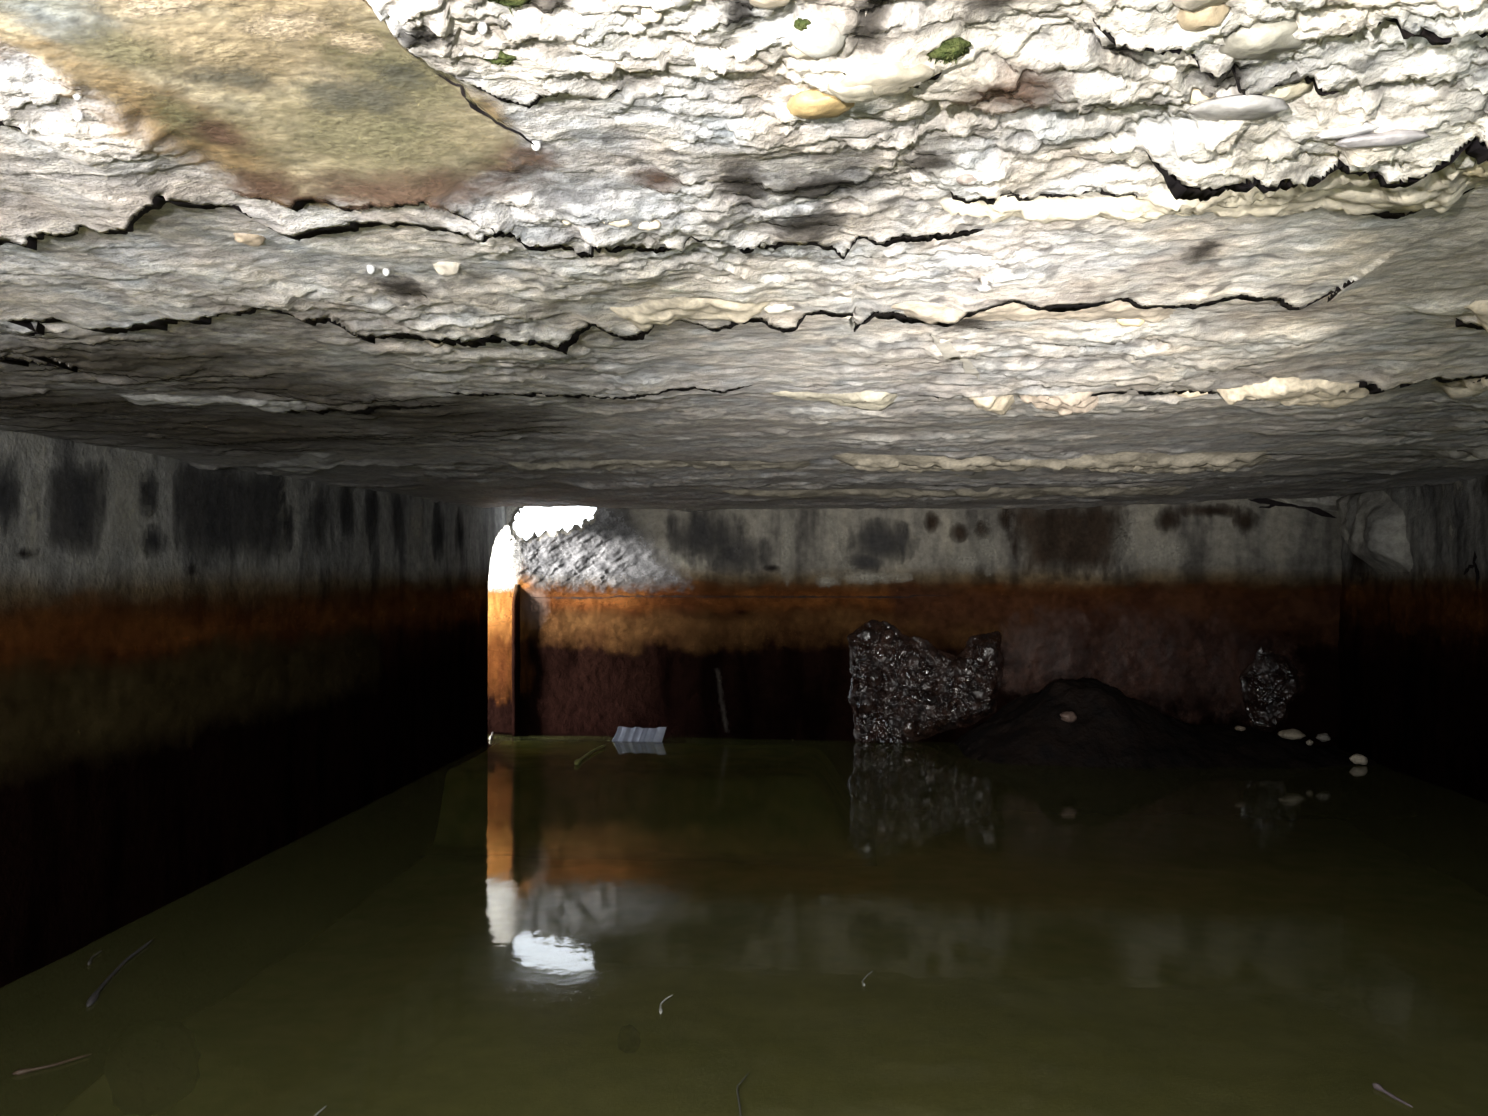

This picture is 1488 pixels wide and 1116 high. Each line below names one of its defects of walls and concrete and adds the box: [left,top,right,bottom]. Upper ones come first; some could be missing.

peeling [1262,79,1313,101]
peeling [1315,122,1431,149]
crack [0,135,1488,260]
peeling [603,219,662,230]
crack [0,280,1355,372]
crack [287,385,752,415]
crack [1090,389,1215,397]
leakage [0,344,533,559]
leakage [509,459,811,471]
leakage [723,451,1272,571]
leakage [851,519,909,581]
corrosion [524,592,546,620]